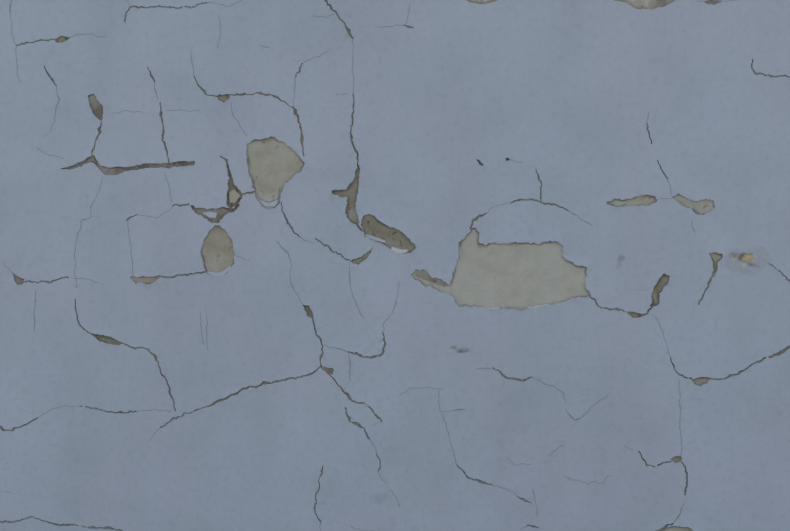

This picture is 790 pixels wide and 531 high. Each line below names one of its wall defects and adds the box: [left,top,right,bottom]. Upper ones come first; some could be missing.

crack [9,0,106,81]
crack [317,0,359,166]
peeling [173,137,312,277]
peeling [332,167,416,254]
crack [470,170,593,230]
peeling [607,194,714,233]
crack [0,52,399,503]
peeling [411,228,591,310]
peeling [650,274,669,307]
crack [589,296,790,524]
crack [0,516,122,531]
peeling [656,523,693,531]